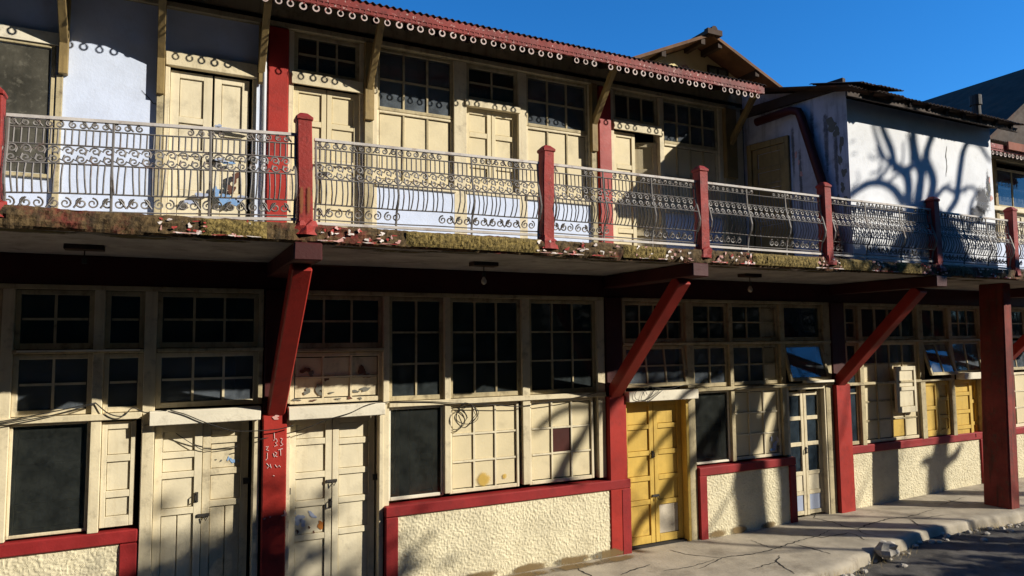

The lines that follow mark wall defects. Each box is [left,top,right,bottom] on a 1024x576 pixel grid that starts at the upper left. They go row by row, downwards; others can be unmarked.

leakage [810,115,838,184]
peeling [136,217,258,240]
peeling [318,226,401,245]
peeling [292,365,371,401]
crack [621,497,966,575]